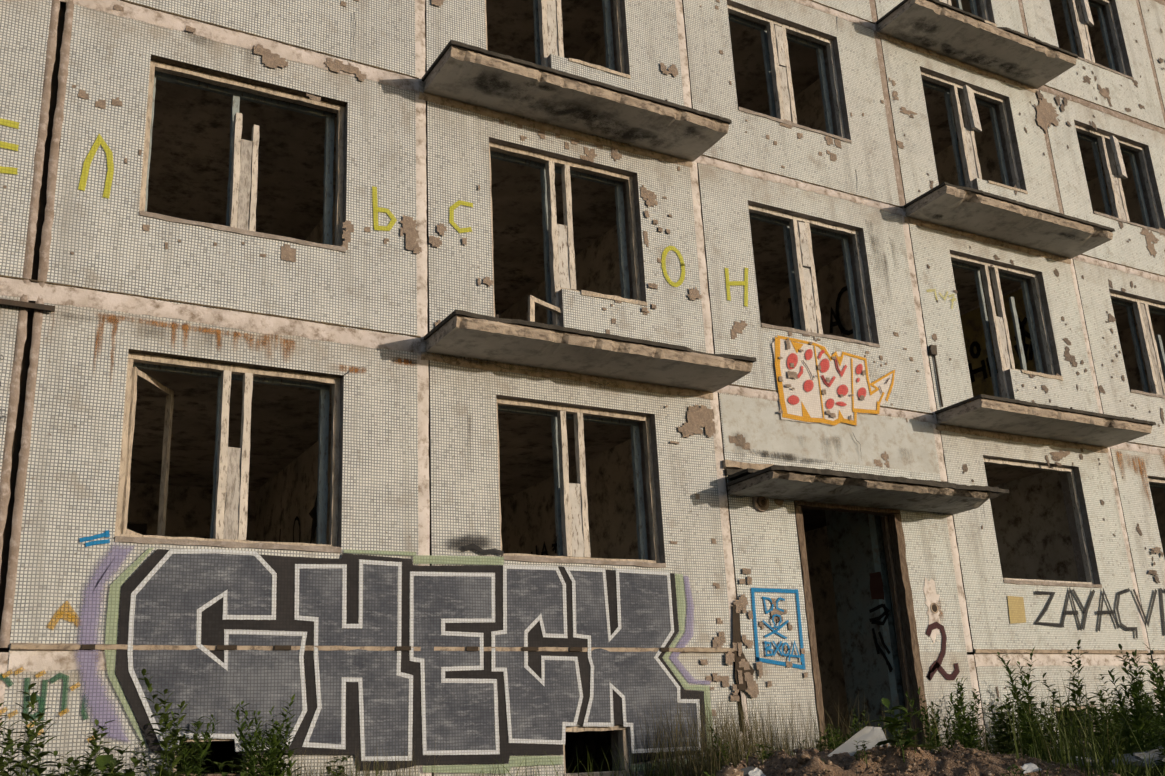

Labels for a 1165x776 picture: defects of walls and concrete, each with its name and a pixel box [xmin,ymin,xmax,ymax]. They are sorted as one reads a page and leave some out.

peeling [254,44,288,69]
peeling [1077,66,1146,112]
peeling [1019,91,1071,134]
peeling [281,244,296,262]
peeling [342,220,371,250]
peeling [384,215,447,254]
peeling [640,185,673,247]
corrosion [95,315,119,357]
corrosion [140,319,294,351]
peeling [670,404,750,450]
flaking render [874,451,890,468]
spalling [700,568,793,701]